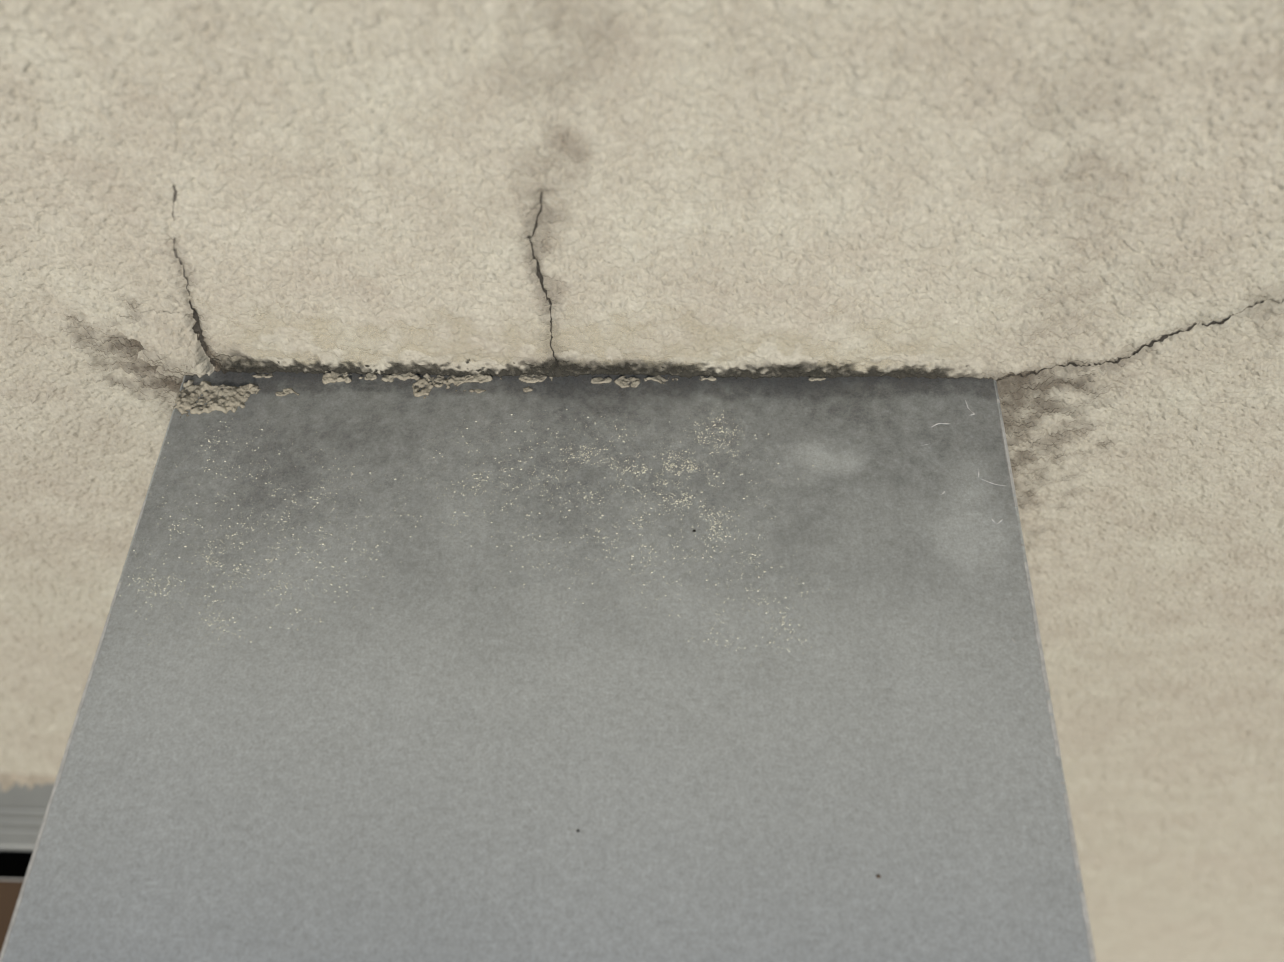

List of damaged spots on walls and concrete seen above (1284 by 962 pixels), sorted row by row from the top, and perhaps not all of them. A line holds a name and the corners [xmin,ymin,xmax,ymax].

crack [172,185,216,366]
crack [527,192,559,369]
crack [996,300,1284,382]